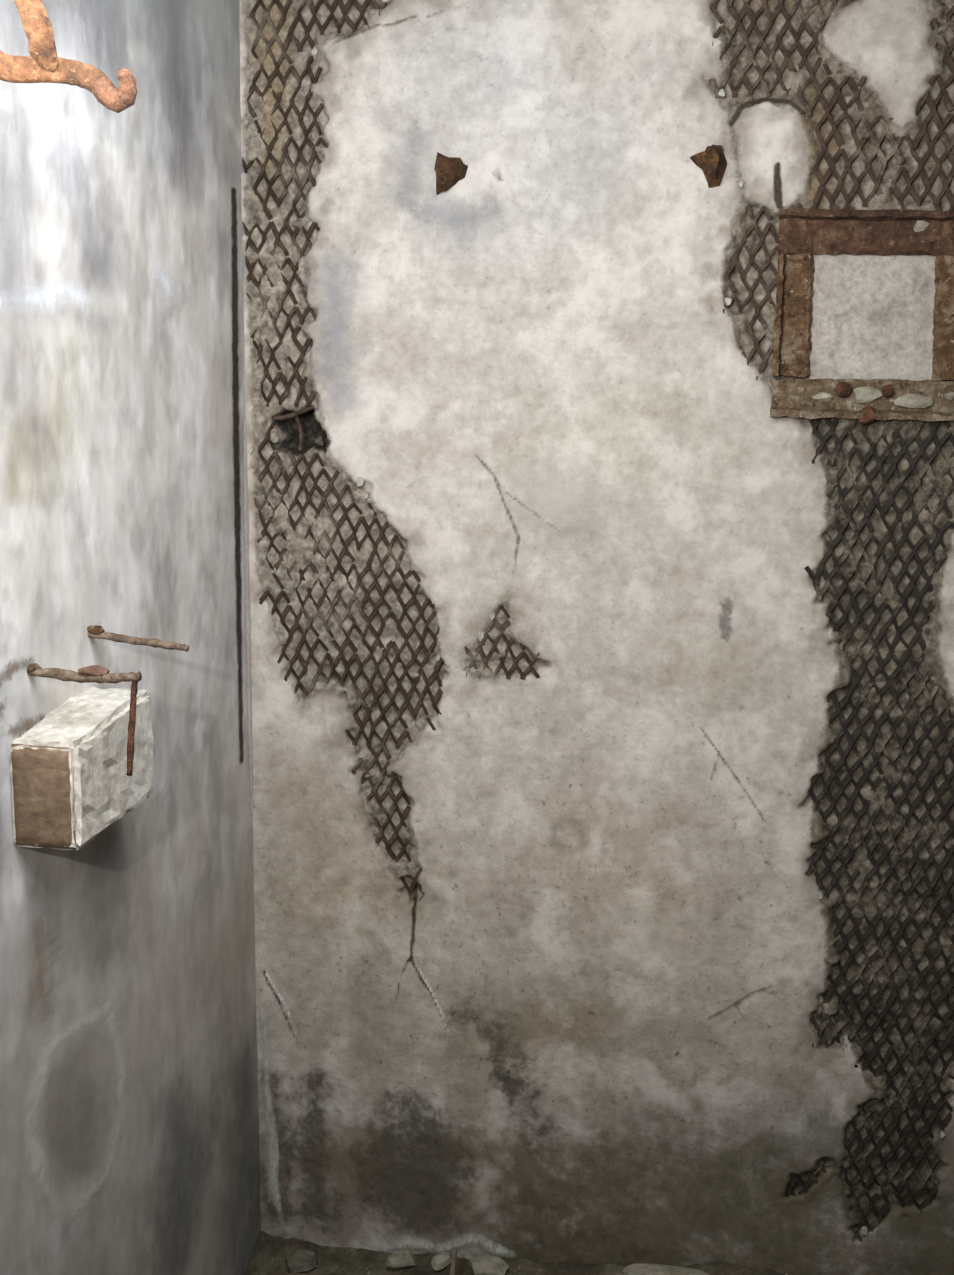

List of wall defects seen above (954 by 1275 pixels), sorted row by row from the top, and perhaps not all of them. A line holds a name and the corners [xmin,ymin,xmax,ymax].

spalling [709,0,954,394]
spalling [242,0,445,901]
rust [87,625,189,652]
spalling [460,602,550,680]
spalling [720,600,732,638]
rust [27,663,142,776]
spalling [783,417,954,1242]
crack [398,884,449,1032]
water stain [235,1011,340,1275]
water stain [451,1011,547,1137]
water stain [351,1094,954,1275]